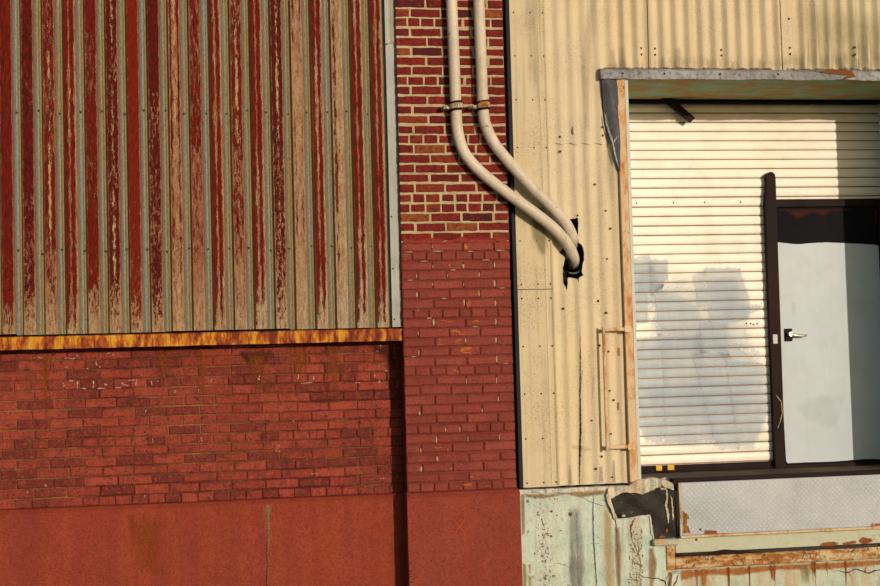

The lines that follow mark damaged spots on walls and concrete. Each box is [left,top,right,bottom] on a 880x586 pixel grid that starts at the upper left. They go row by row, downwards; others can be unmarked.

hole [559,218,584,289]
crack [579,336,617,586]
crack [264,510,272,586]
spalling [605,477,678,586]
rust [630,518,657,586]
rust [681,560,880,586]
crack [828,566,880,578]